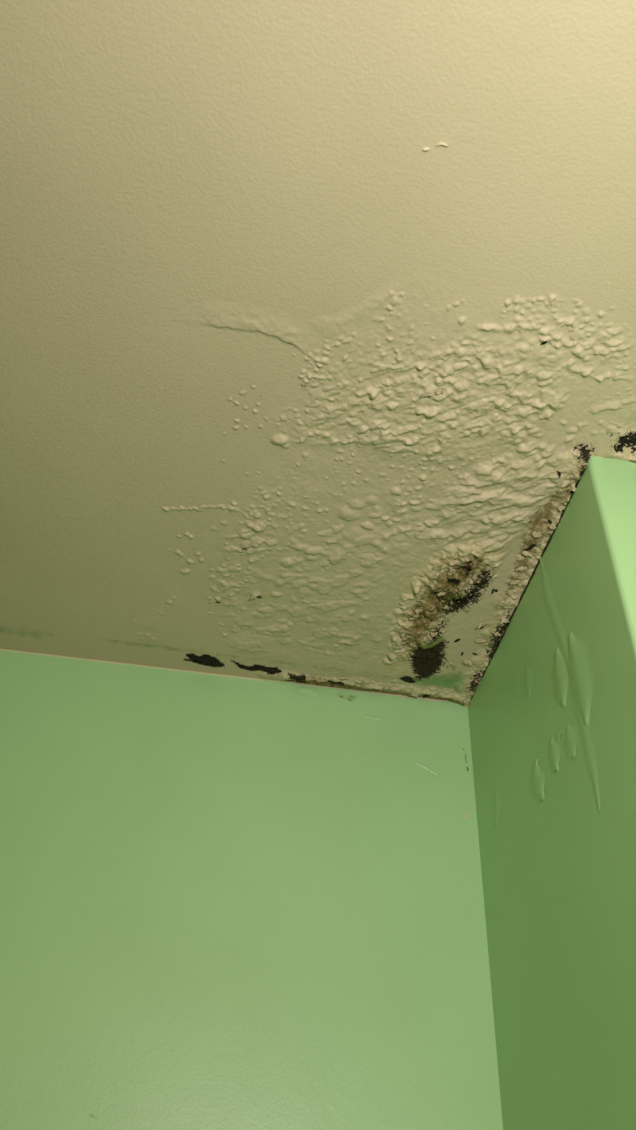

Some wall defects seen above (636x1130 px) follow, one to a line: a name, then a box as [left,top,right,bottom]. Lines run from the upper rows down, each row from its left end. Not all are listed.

leakage [607,430,636,453]
leakage [184,442,596,706]